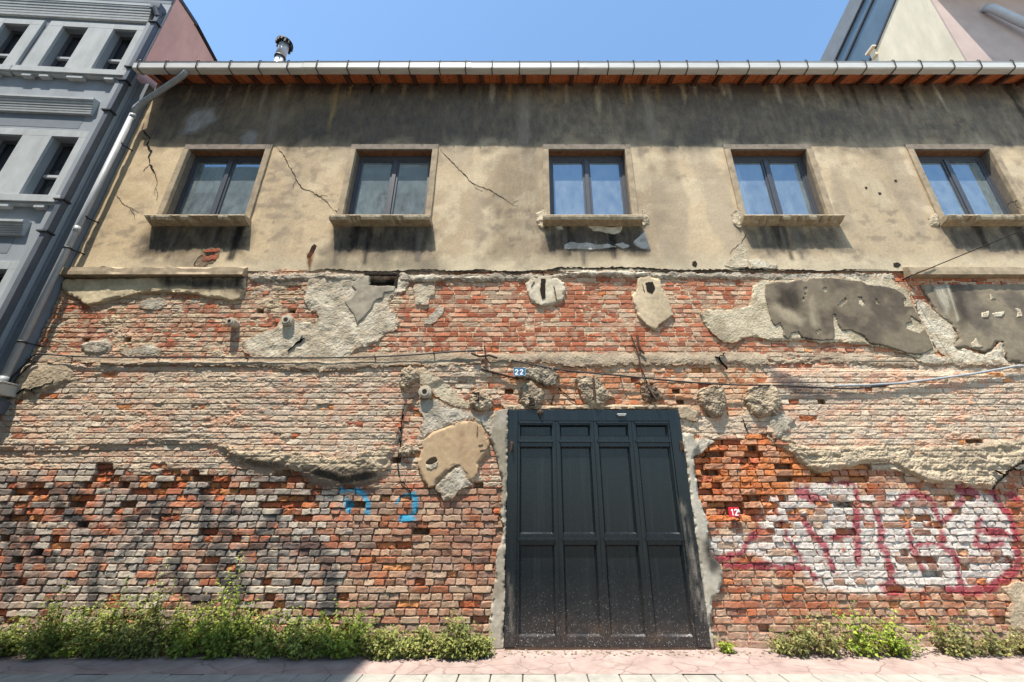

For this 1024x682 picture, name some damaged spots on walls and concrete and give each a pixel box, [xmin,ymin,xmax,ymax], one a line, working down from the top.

water stain [150,83,1024,150]
crack [142,123,158,193]
crack [440,149,516,206]
peeling [564,210,651,250]
flaking render [62,247,247,310]
flaking render [242,275,445,373]
flaking render [699,243,1024,366]
flaking render [16,362,74,400]
flaking render [209,438,405,485]
flaking render [416,367,494,501]
flaking render [693,437,714,458]
flaking render [764,412,1024,490]